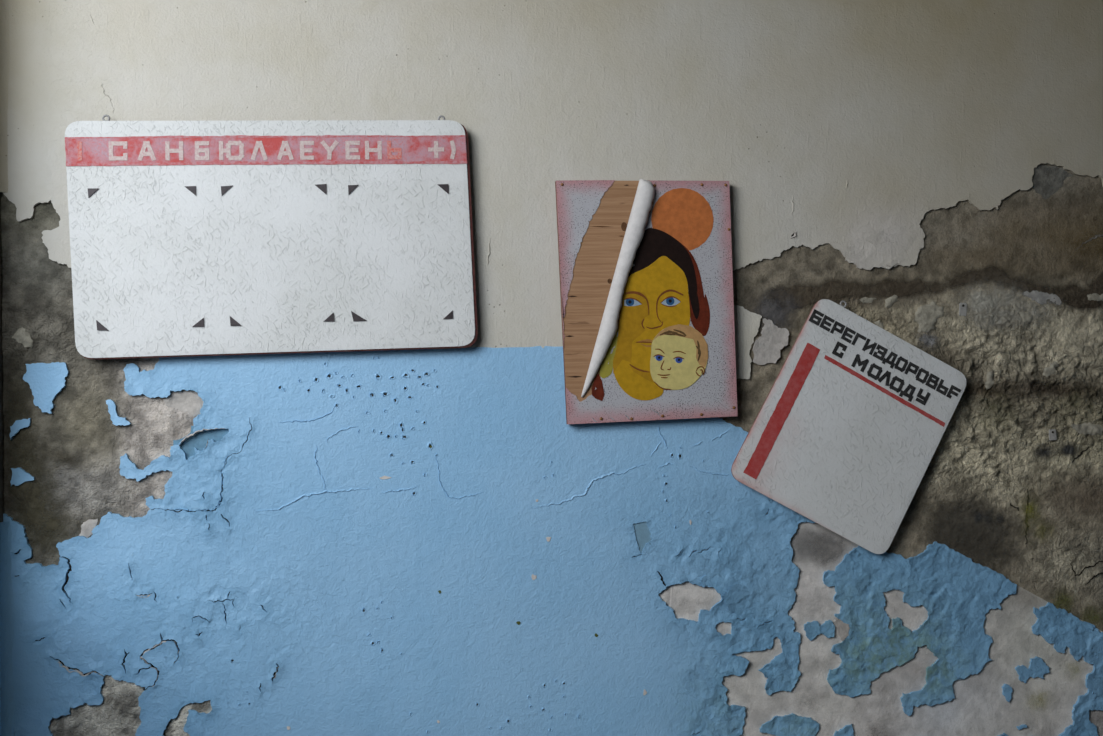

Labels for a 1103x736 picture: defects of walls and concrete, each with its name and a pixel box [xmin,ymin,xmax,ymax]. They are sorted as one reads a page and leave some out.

damp [758,266,1103,330]
flaking render [0,192,229,566]
crack [152,429,252,528]
crack [257,406,480,512]
flaking render [719,163,1103,736]
crack [59,555,72,595]
crack [35,592,234,691]
peeling [658,572,757,635]
peeling [49,672,145,736]
peeling [164,700,212,736]